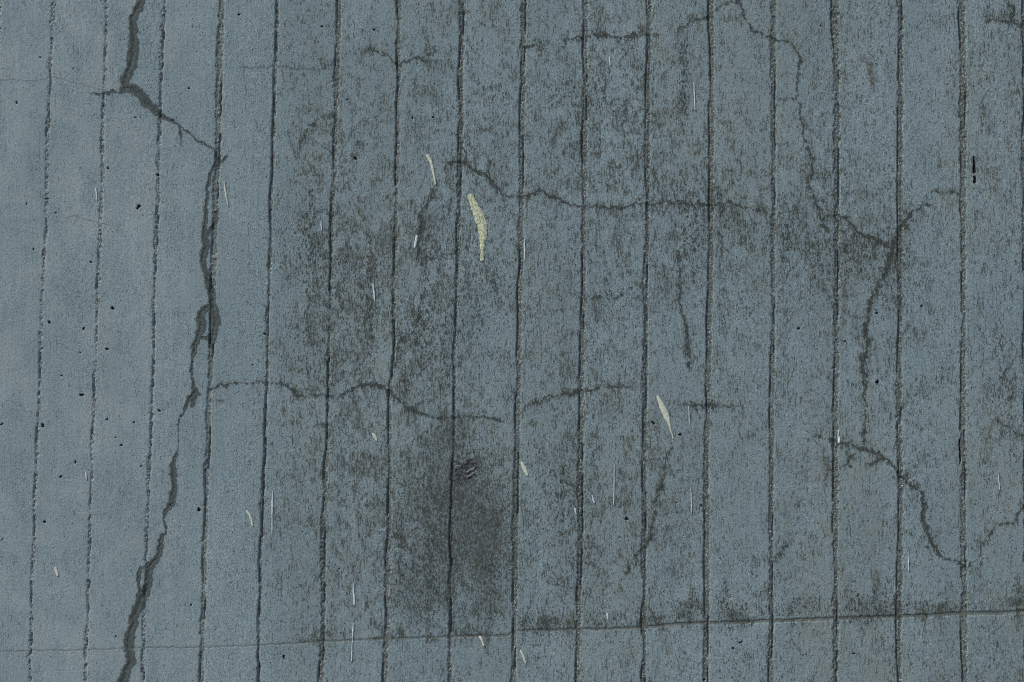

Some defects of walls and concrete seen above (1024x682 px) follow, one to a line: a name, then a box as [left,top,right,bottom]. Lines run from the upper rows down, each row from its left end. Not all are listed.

crack [90,0,643,682]
crack [416,146,766,268]
crack [521,0,1024,575]